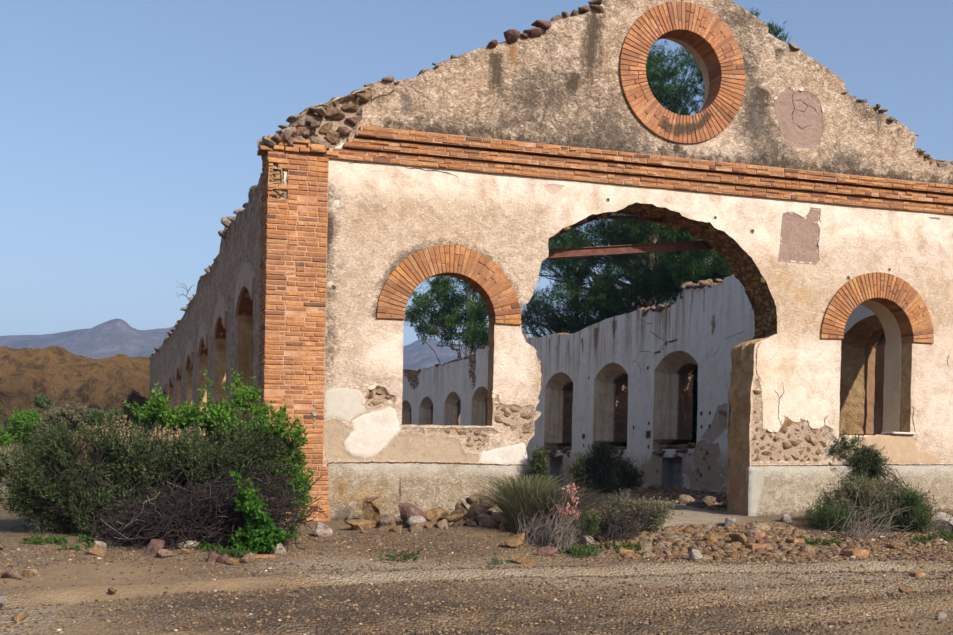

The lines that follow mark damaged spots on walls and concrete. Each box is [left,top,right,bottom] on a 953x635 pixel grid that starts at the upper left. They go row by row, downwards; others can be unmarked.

damp [489,53,504,94]
damp [567,13,603,93]
damp [382,87,953,185]
peeling [778,207,823,265]
crack [636,311,677,362]
spalling [361,383,396,409]
peeling [324,419,489,463]
peeling [700,403,728,443]